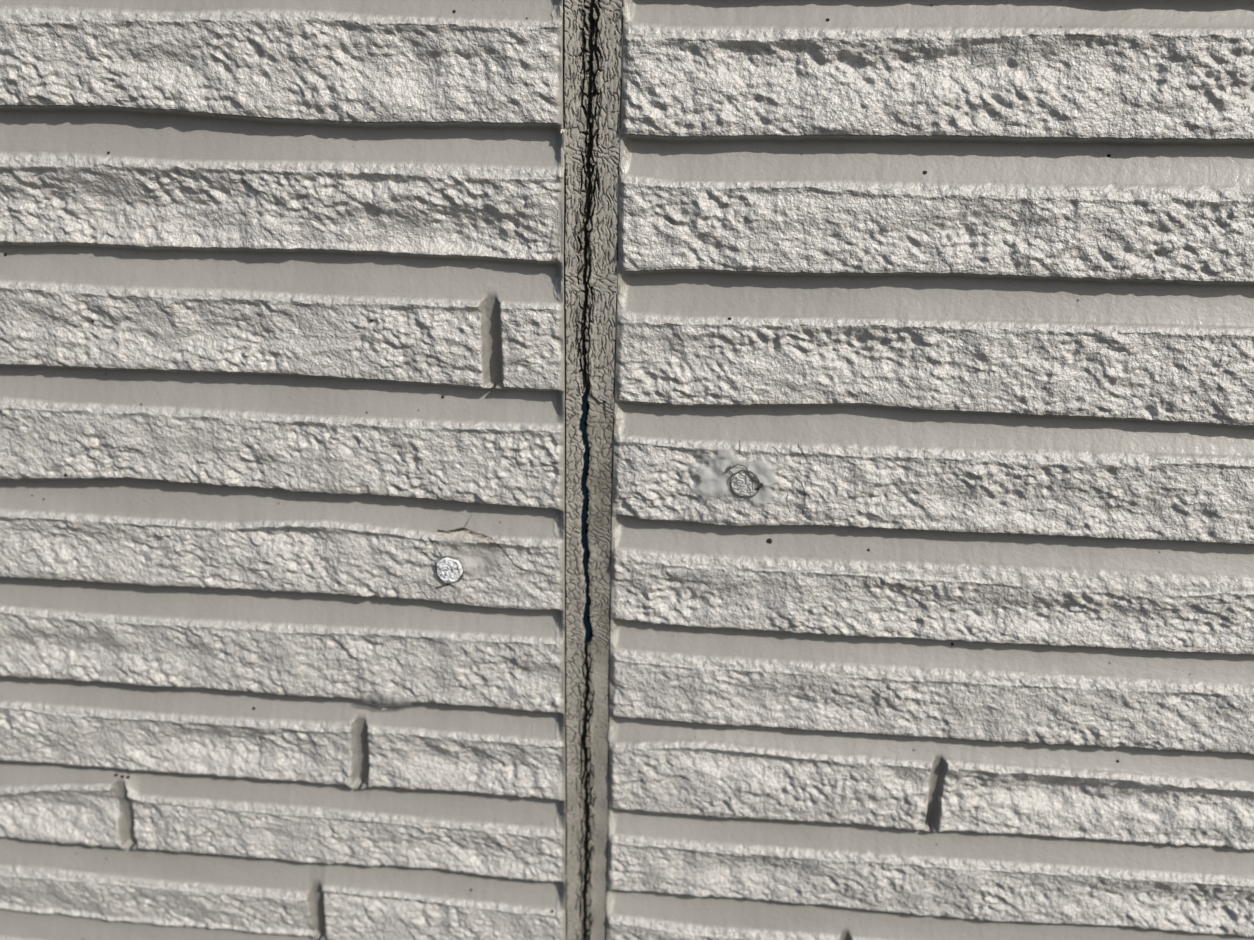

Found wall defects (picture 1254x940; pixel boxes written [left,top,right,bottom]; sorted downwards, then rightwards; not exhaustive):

crack [563,0,623,940]